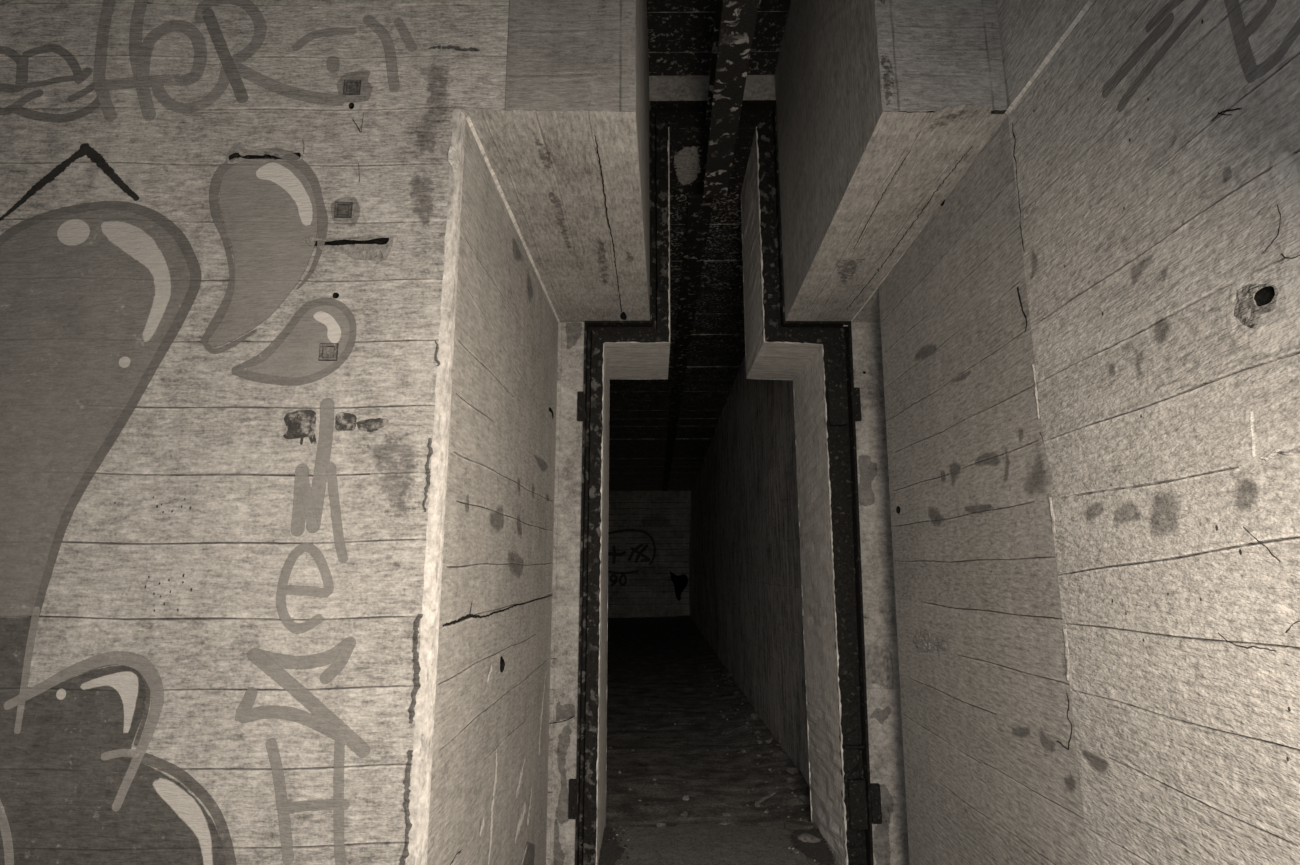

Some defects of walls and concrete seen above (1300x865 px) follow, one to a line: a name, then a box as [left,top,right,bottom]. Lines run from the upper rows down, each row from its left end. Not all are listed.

damp [405,44,480,227]
crack [594,135,622,312]
crack [443,595,552,627]